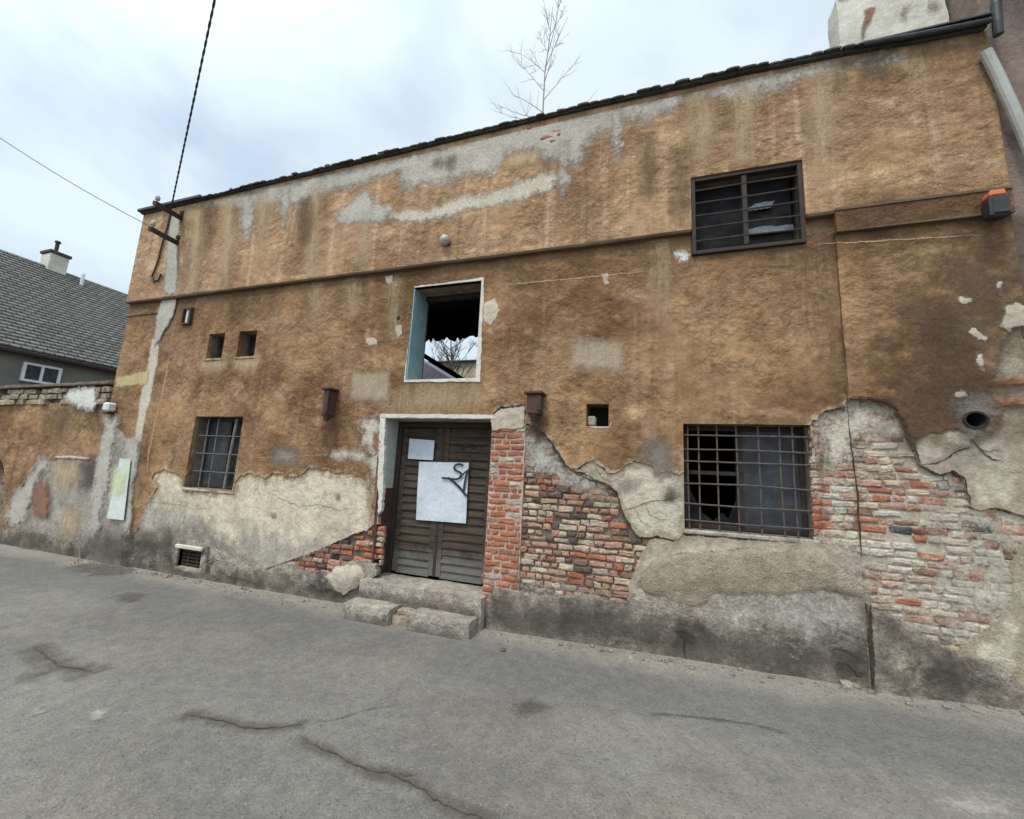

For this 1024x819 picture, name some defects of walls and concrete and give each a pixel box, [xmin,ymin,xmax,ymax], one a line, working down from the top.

flaking render [202,49,903,242]
flaking render [5,455,78,530]
flaking render [134,418,387,572]
leakage [0,495,1001,707]
flaking render [482,281,1024,683]
crack [820,224,1000,689]